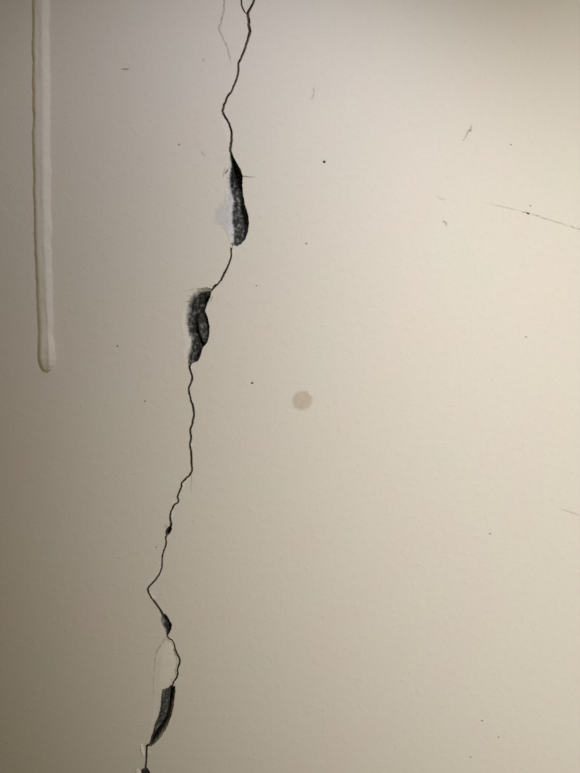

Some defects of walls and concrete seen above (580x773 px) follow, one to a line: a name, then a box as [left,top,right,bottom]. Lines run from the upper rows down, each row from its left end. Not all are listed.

crack [221,0,255,154]
spalling [217,152,249,248]
crack [210,243,233,292]
spalling [180,287,212,366]
crack [147,359,195,615]
spalling [145,614,178,747]
crack [167,635,181,687]
crack [141,743,150,770]